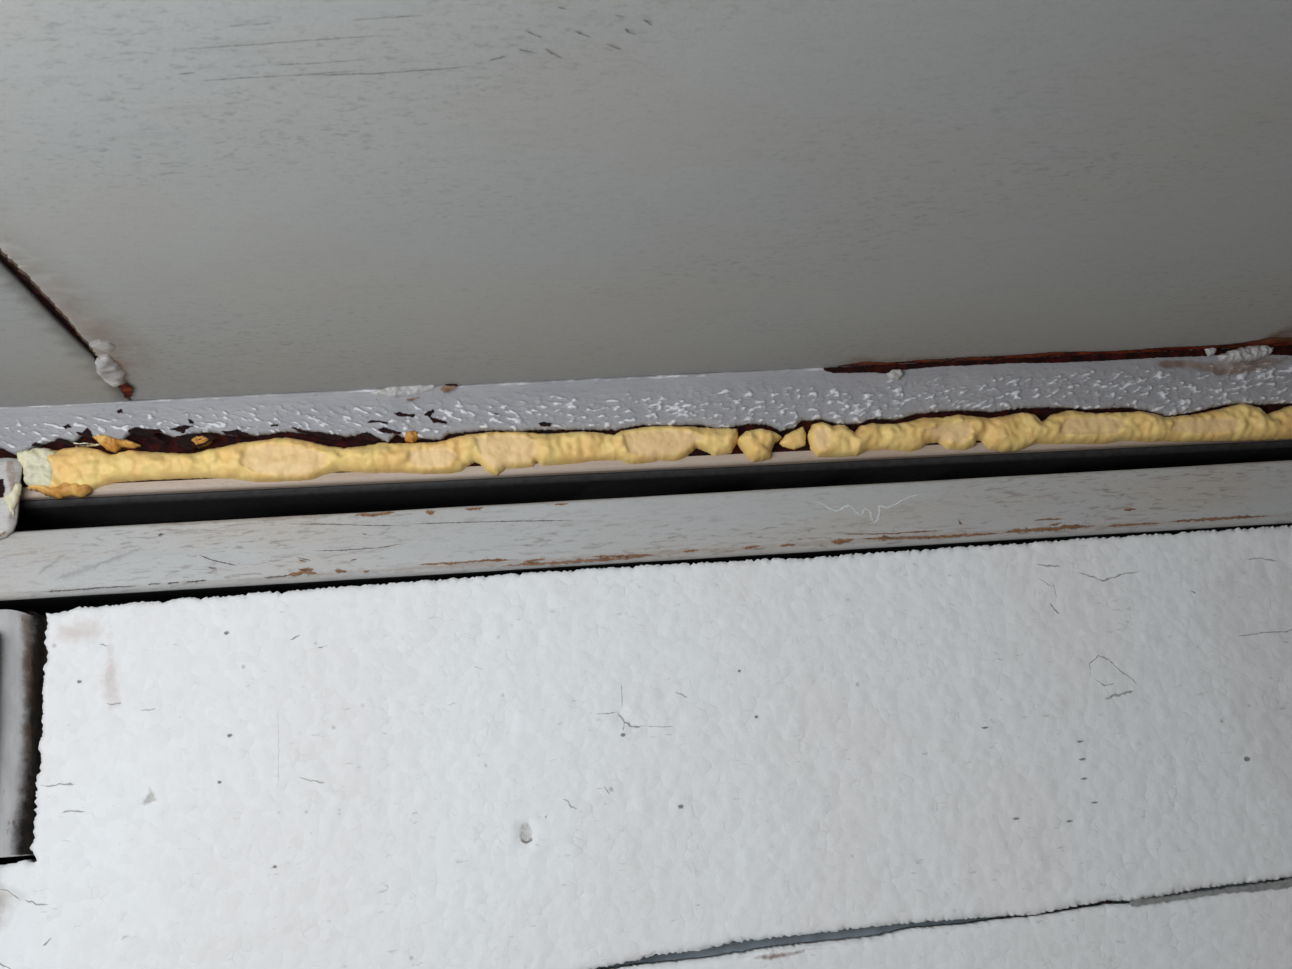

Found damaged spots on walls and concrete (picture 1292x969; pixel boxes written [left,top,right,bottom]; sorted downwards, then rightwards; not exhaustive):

corrosion [824,337,1292,374]
peeling [32,419,253,454]
peeling [271,409,447,443]
crack [1099,878,1292,907]